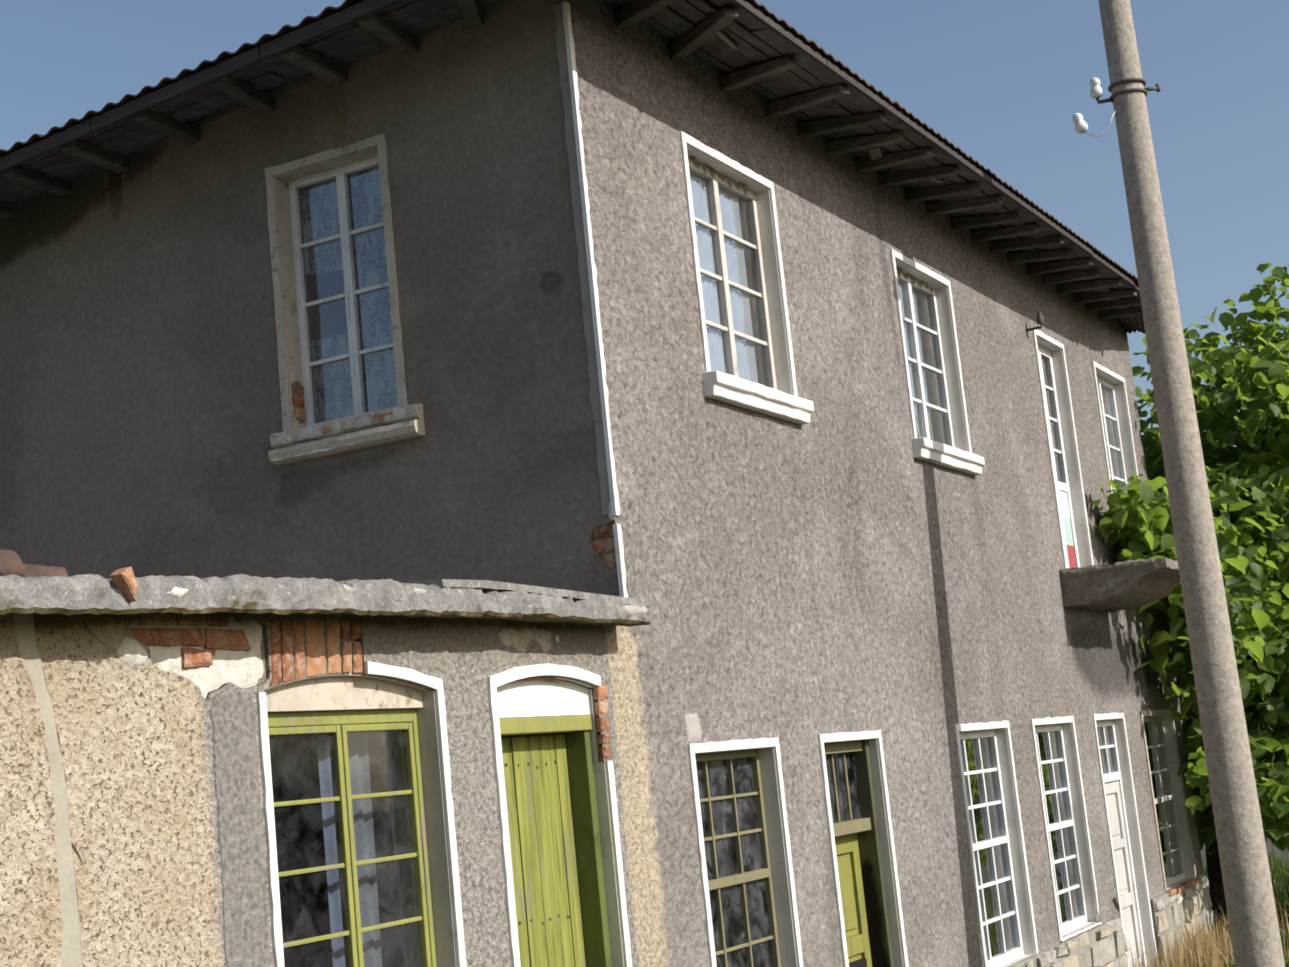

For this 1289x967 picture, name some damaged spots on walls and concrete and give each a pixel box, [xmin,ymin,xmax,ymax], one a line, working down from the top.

flaking render [591,502,616,570]
spalling [129,587,264,699]